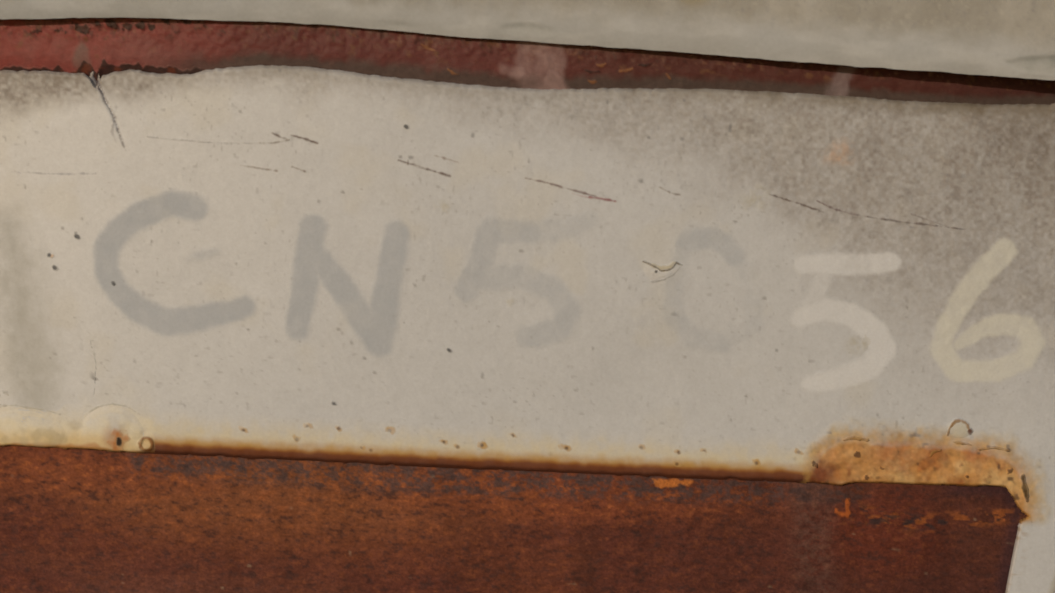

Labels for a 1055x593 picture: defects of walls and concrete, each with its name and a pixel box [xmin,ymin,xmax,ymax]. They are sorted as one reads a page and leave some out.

crack [89,71,127,152]
corrosion [0,399,1055,529]